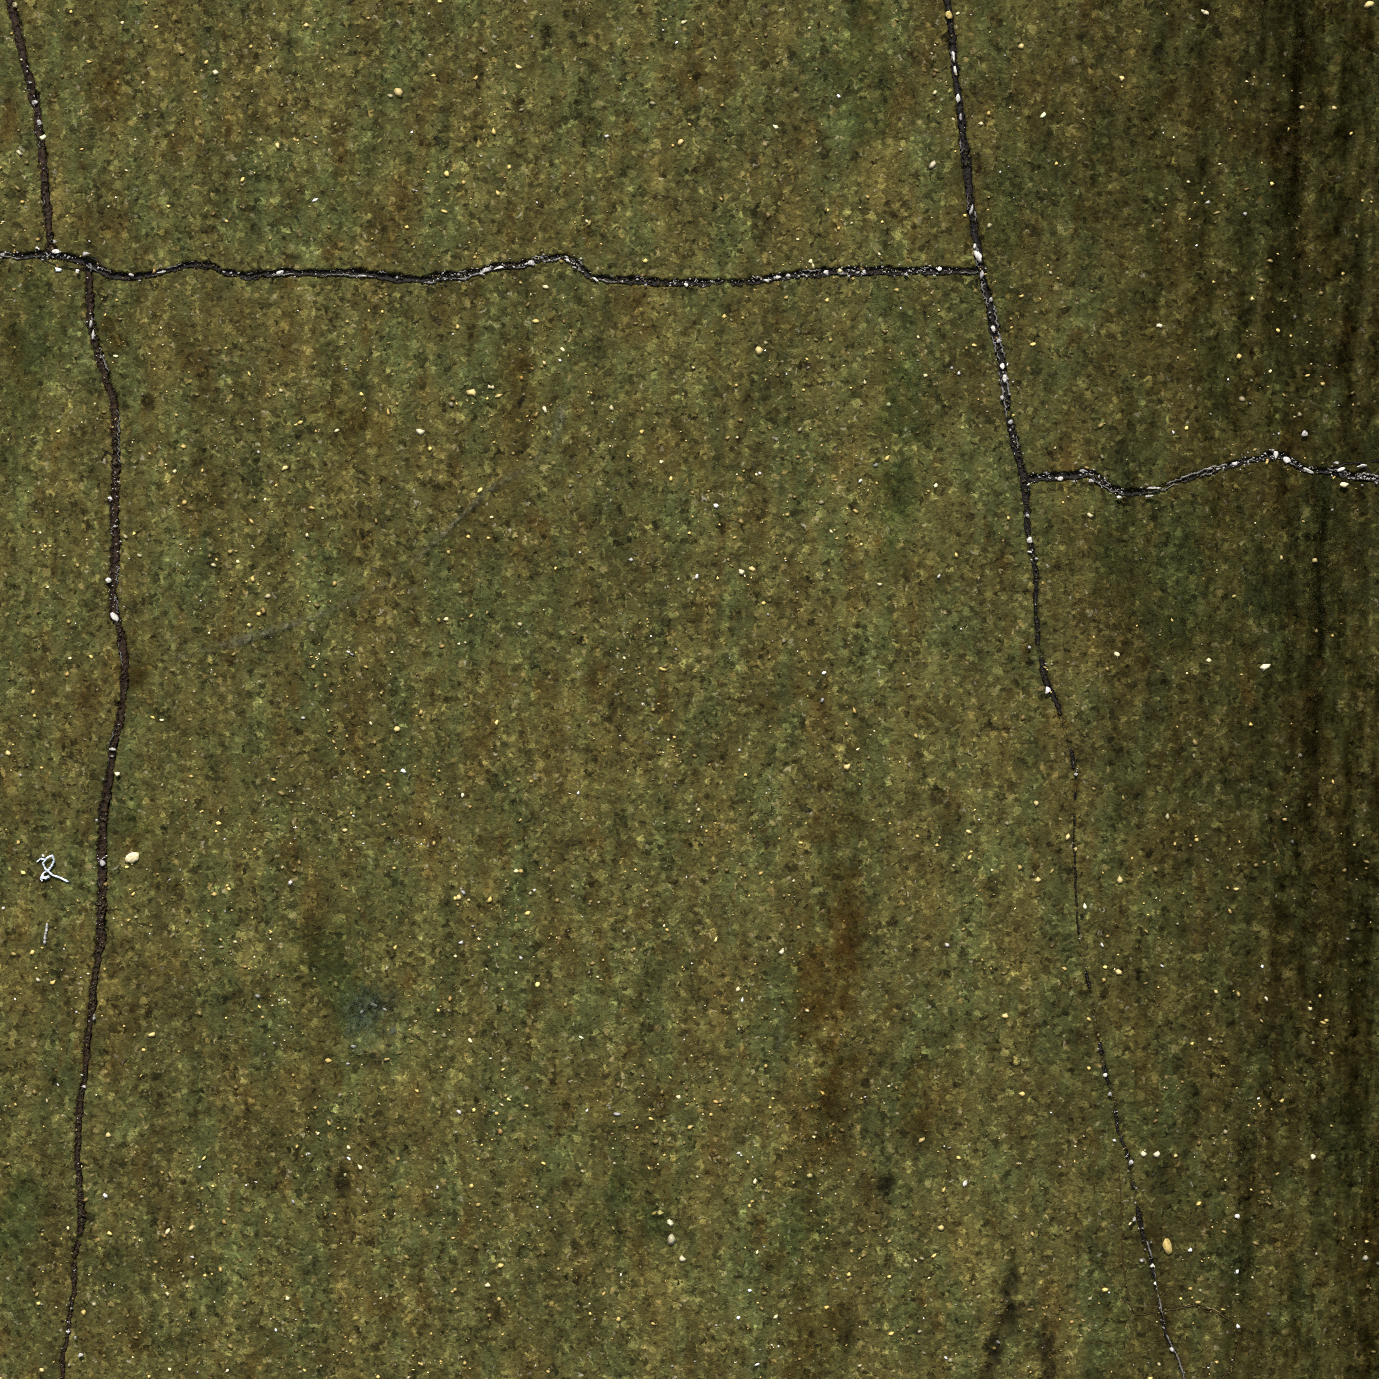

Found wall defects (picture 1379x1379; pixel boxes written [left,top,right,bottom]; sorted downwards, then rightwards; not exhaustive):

crack [0,0,1179,1185]
crack [1166,449,1379,486]
water stain [1259,0,1379,1379]
crack [58,1241,81,1379]
crack [76,1188,86,1234]
crack [1072,814,1239,1379]